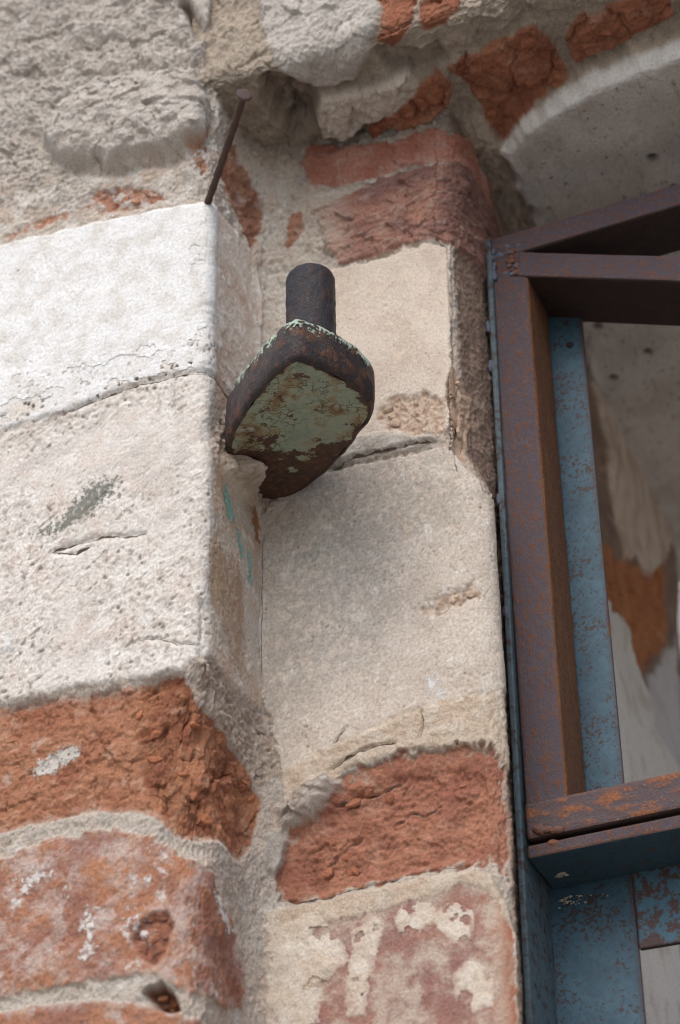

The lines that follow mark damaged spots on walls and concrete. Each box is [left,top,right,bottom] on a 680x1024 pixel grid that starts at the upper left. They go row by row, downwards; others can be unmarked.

flaking render [368,0,680,227]
crack [52,534,143,555]
crack [335,440,433,470]
flaking render [583,322,680,675]
spalling [133,657,280,846]
spalling [301,768,491,896]